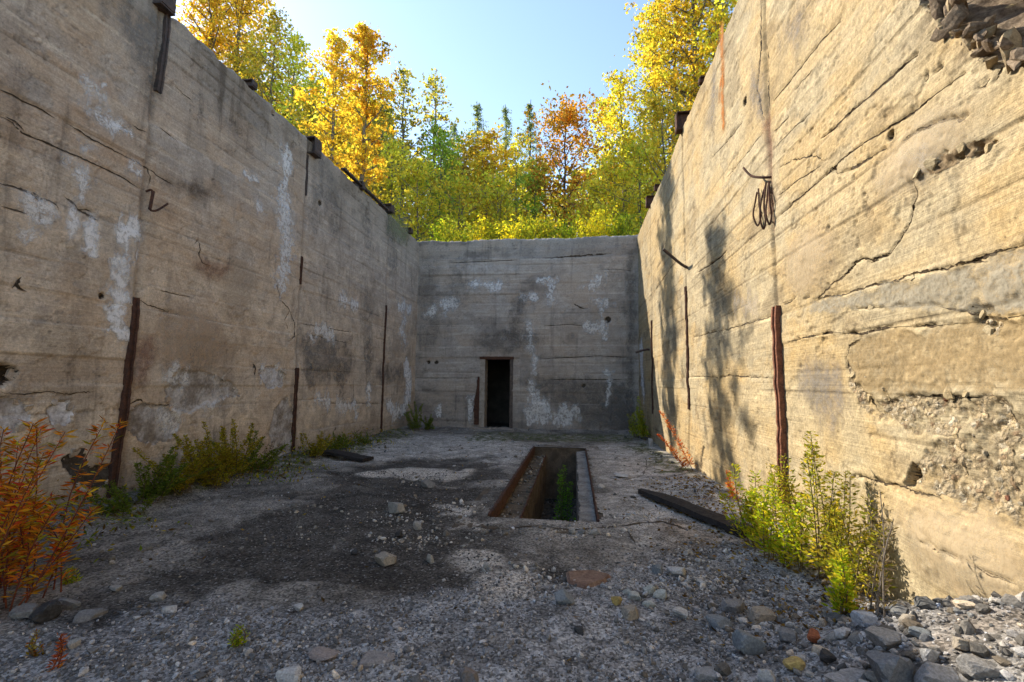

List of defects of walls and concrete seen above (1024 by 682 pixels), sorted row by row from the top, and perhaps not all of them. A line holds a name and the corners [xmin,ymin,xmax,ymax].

spalling [919,0,1024,74]
crack [0,90,171,189]
spalling [913,138,994,179]
spalling [0,365,19,385]
efflorescence [103,216,141,341]
peeling [126,367,240,448]
efflorescence [273,145,294,299]
leakage [480,268,645,430]
crack [700,181,1022,420]
spalling [848,365,1024,527]